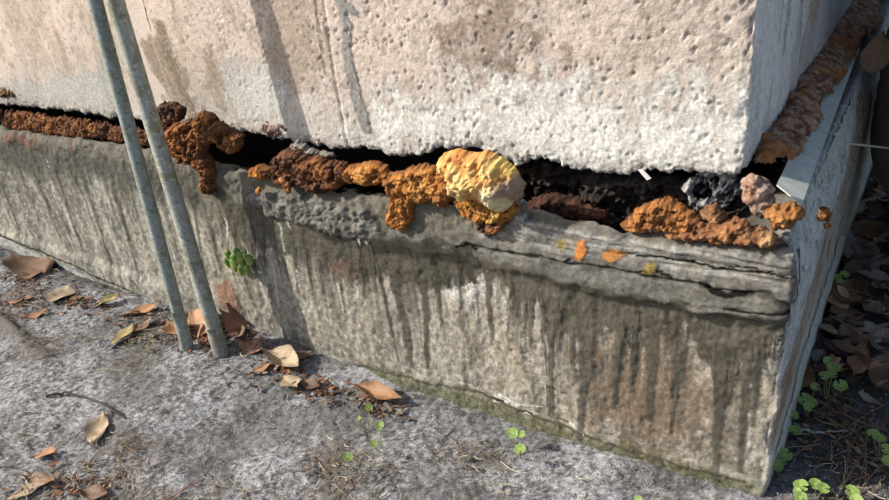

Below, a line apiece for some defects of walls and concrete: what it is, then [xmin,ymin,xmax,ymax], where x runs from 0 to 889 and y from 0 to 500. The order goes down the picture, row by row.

crack [314,0,371,134]
spalling [557,161,624,175]
water stain [0,140,142,266]
crack [455,243,478,251]
rust [558,240,586,261]
rust [602,250,626,263]
water stain [54,262,132,294]
crack [604,248,815,316]
water stain [179,181,785,481]